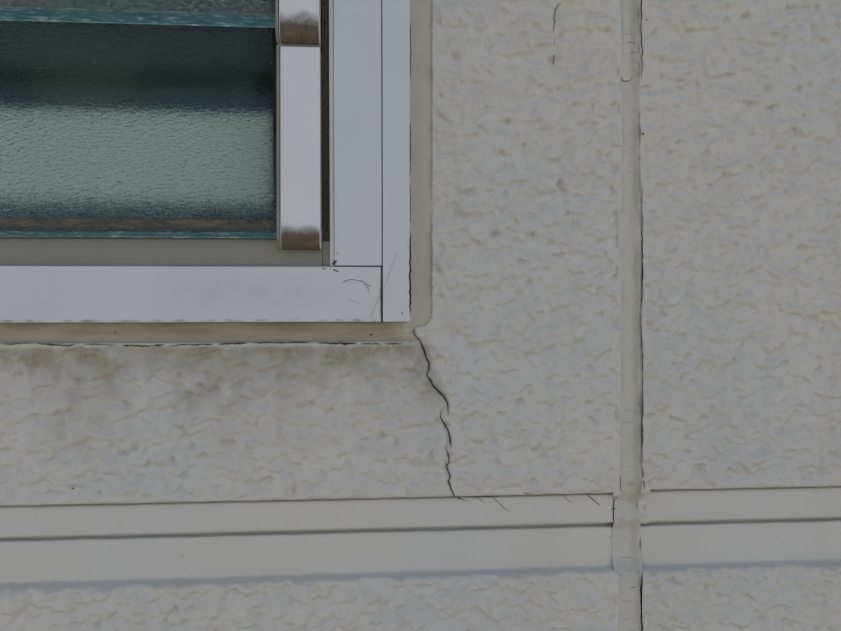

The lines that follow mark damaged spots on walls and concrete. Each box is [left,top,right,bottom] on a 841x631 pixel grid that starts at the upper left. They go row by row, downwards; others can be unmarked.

crack [407,19,415,80]
crack [6,122,508,511]
crack [563,133,645,527]
crack [622,538,643,631]